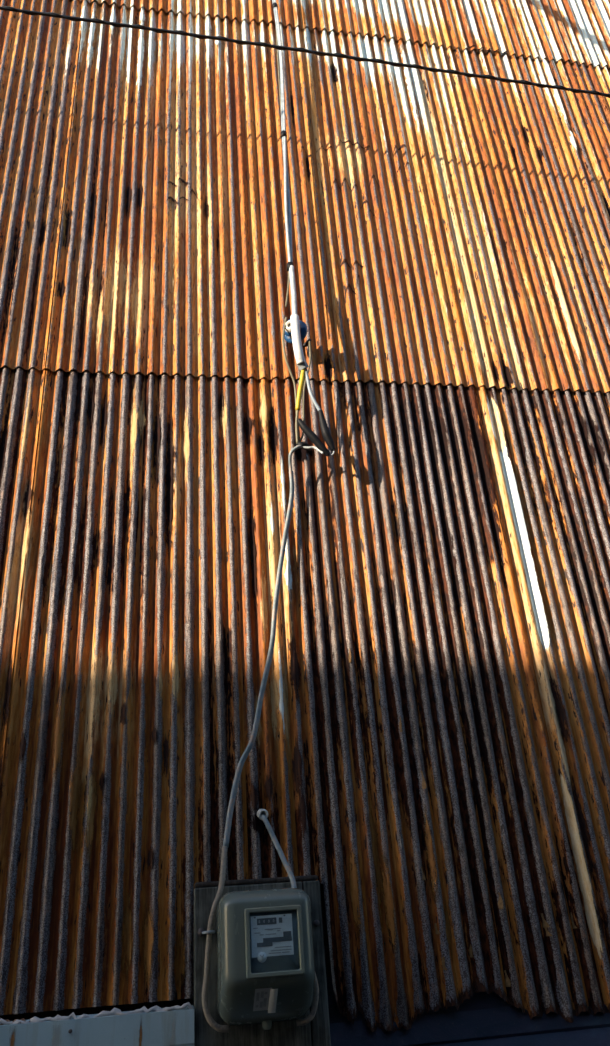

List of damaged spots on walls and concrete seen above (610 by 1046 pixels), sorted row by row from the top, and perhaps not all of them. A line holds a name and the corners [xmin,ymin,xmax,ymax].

corrosion [22,475,32,517]
corrosion [53,687,104,862]
corrosion [150,726,169,776]
corrosion [289,634,301,703]
corrosion [548,668,570,752]
corrosion [568,767,598,884]
corrosion [349,849,361,940]
corrosion [369,802,396,950]
corrosion [424,809,453,961]
corrosion [121,896,154,981]
corrosion [174,931,185,989]